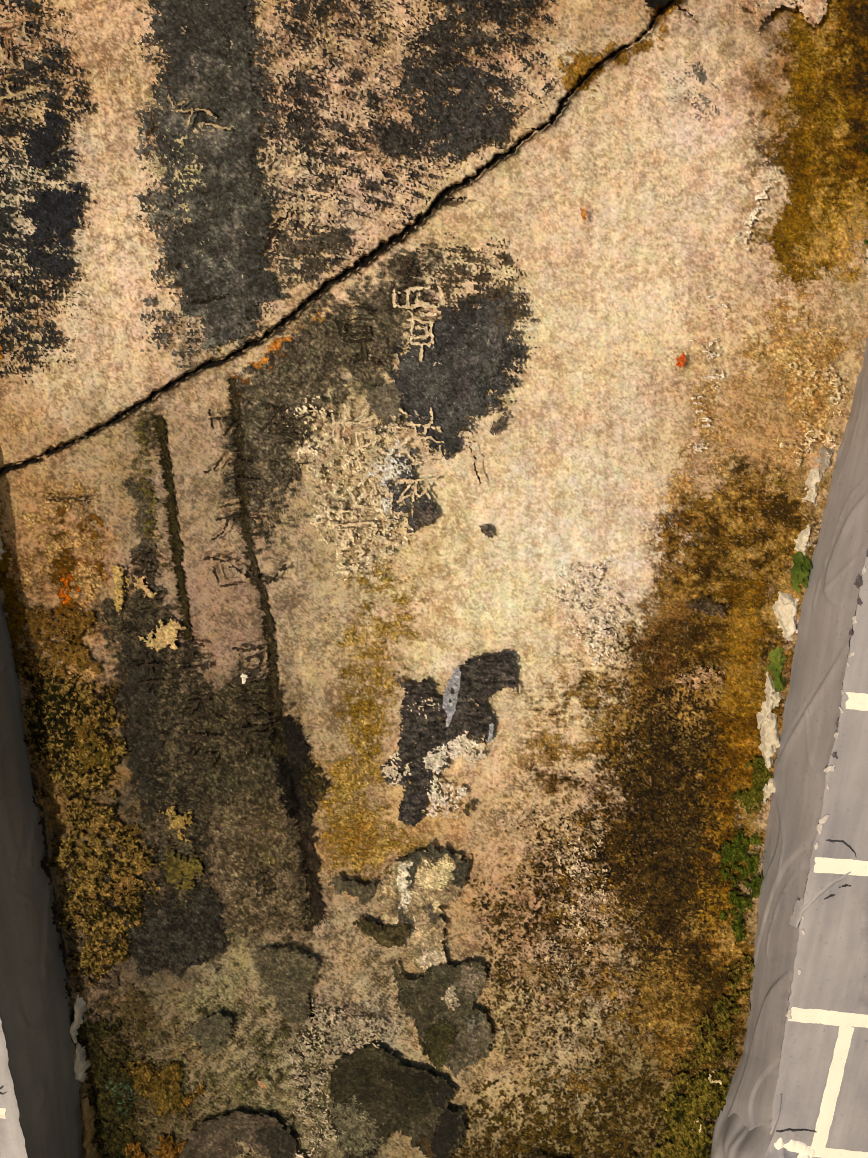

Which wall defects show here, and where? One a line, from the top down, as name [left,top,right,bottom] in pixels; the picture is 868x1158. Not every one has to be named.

crack [0,0,694,474]
leakage [0,241,443,984]
crack [469,446,481,484]
leakage [451,0,868,1158]
leakage [422,731,486,819]
leakage [32,782,122,1054]
leakage [281,995,400,1158]